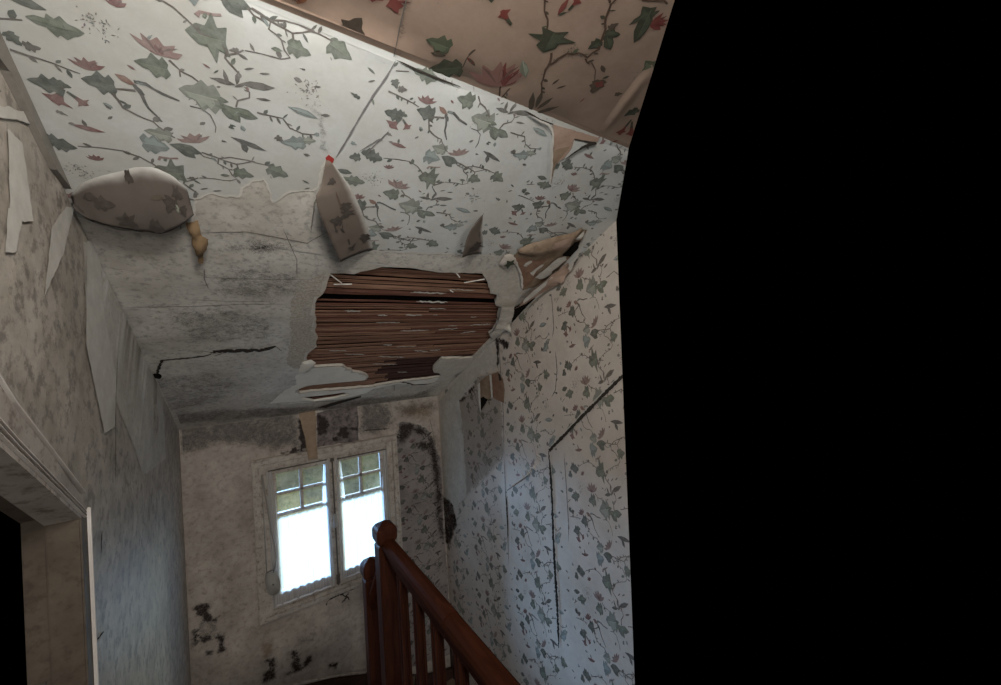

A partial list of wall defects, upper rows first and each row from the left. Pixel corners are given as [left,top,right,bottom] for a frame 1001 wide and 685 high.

peeling [0,105,33,253]
crack [153,346,282,379]
flaking render [45,161,547,517]
water stain [181,392,457,601]
water stain [194,603,217,622]
water stain [192,631,225,655]
water stain [408,590,432,666]